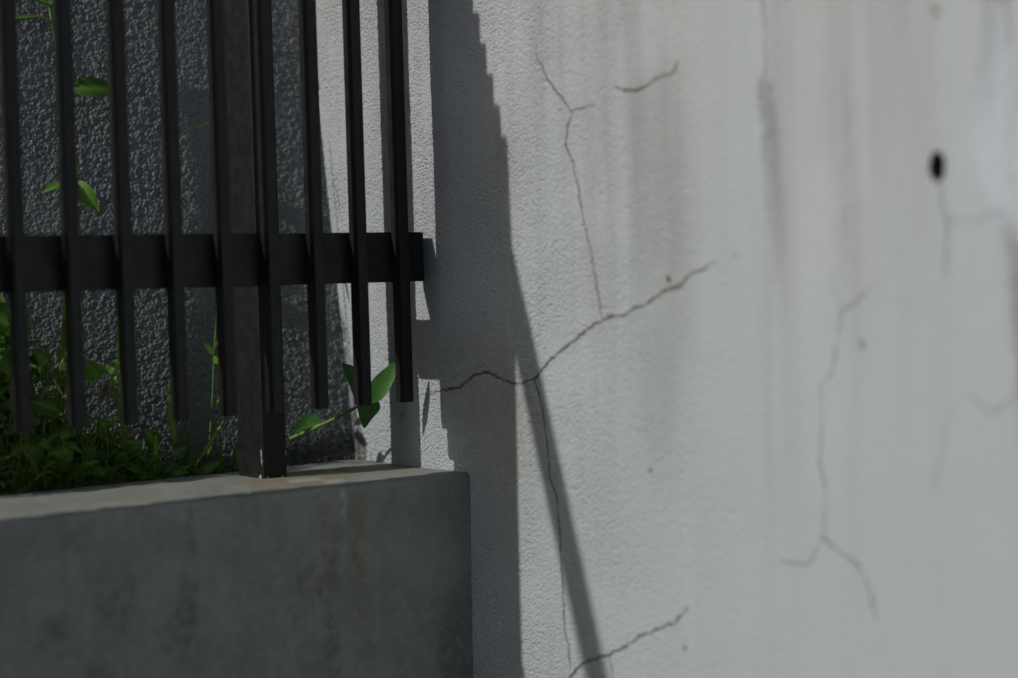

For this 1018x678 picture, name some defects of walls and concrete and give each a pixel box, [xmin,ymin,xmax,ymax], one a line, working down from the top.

crack [430,36,715,678]